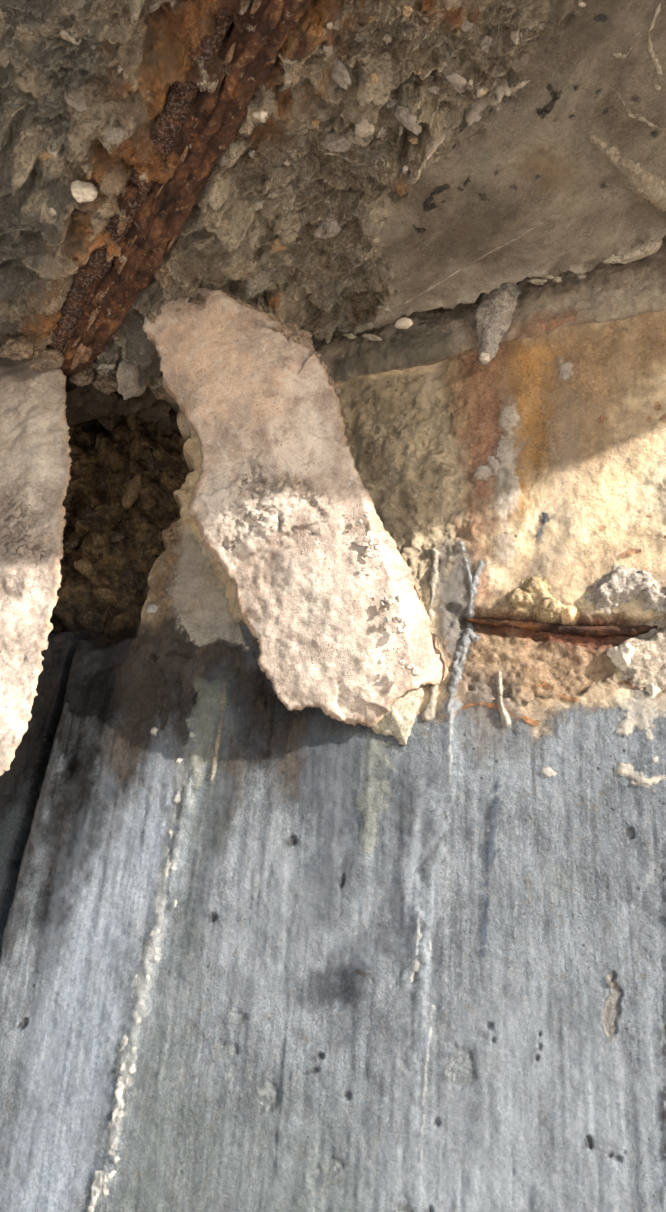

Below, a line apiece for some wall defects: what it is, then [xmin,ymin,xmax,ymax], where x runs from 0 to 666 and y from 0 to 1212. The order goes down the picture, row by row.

spalling [11,0,160,242]
spalling [91,337,163,400]
rust [26,0,349,375]
spalling [190,15,489,281]
crack [414,177,490,233]
crack [400,226,538,306]
damp [0,520,367,1212]
damp [390,772,439,1015]
damp [436,546,620,754]
rust [464,612,658,664]
spalling [606,617,666,738]
peeling [616,762,665,792]